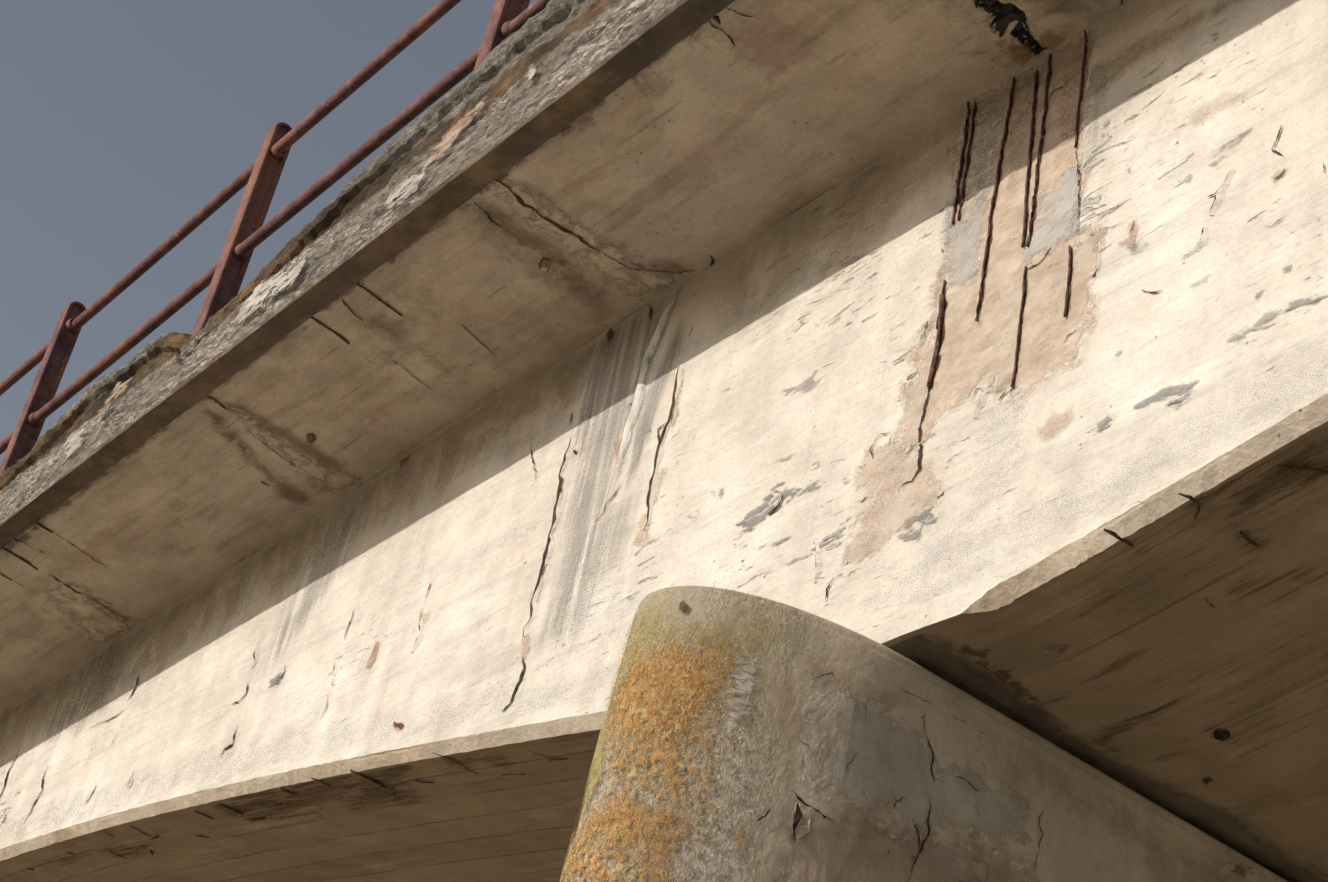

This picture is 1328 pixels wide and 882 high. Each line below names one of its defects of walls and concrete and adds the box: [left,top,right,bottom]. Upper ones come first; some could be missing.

crack [474,180,714,273]
spalling [898,0,1106,490]
leakage [495,176,695,606]
crack [596,325,693,542]
crack [502,413,578,712]
leakage [220,765,418,820]
flaking render [792,683,1030,848]